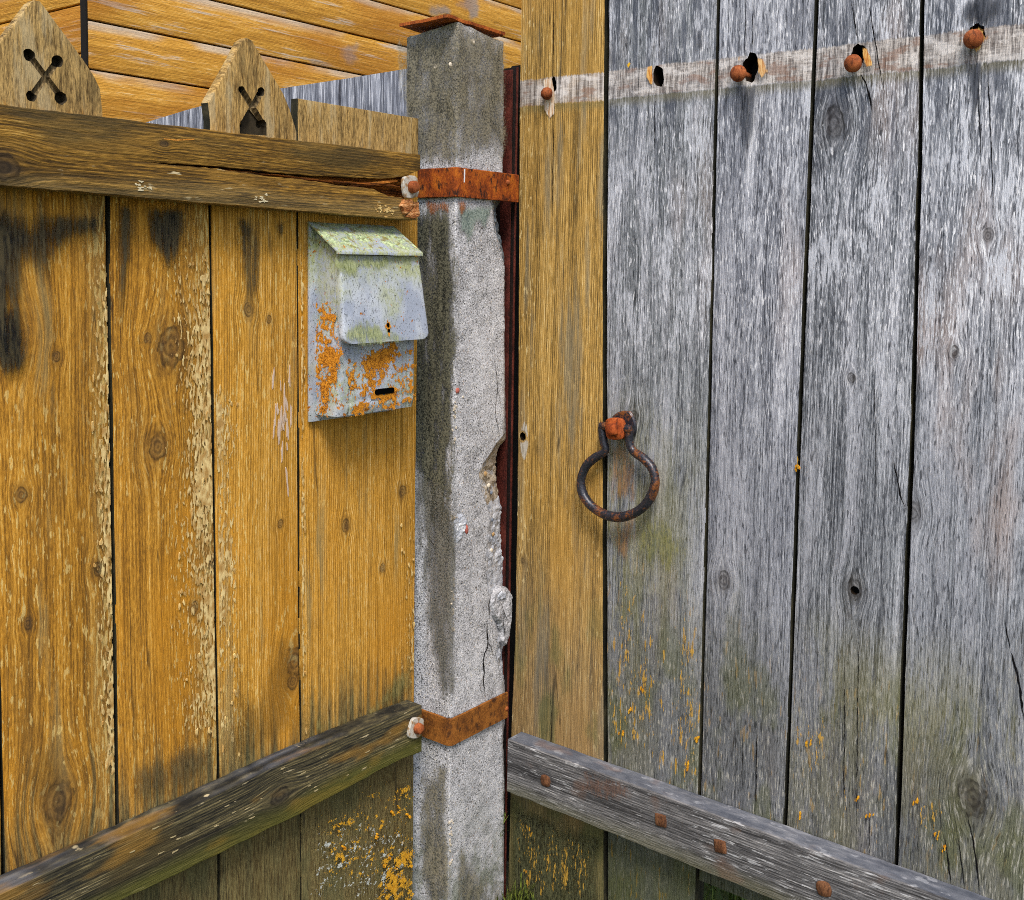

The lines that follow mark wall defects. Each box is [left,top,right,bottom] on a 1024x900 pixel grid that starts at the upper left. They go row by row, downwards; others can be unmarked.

damp [0,214,96,373]
damp [120,207,130,294]
damp [148,209,184,263]
crack [170,164,404,199]
damp [335,258,387,275]
corrosion [316,303,417,417]
peeling [167,249,245,757]
damp [406,206,490,696]
spalling [479,432,506,595]
crack [481,597,493,693]
damp [421,768,499,900]